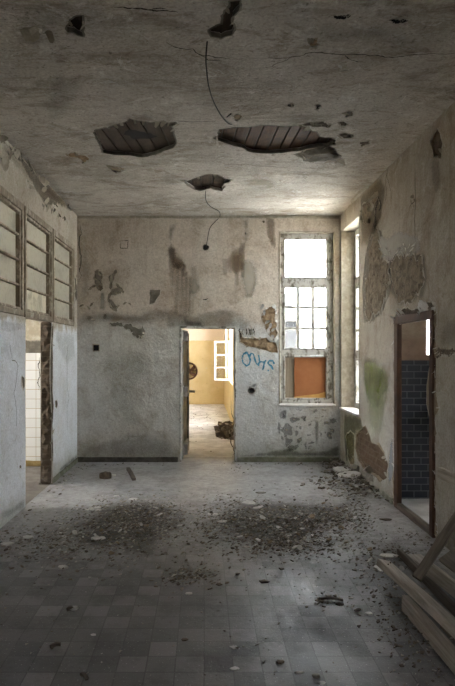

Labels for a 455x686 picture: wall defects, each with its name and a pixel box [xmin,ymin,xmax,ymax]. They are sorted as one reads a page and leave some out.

spalling [207,0,242,39]
crack [268,52,453,66]
spalling [93,118,179,158]
spalling [213,111,372,155]
peeling [0,135,71,221]
spalling [180,174,233,192]
damp [229,252,253,293]
peeling [360,192,438,356]
peeling [79,269,145,339]
peeling [239,304,279,353]
peeling [278,409,337,450]
spalling [346,426,394,502]